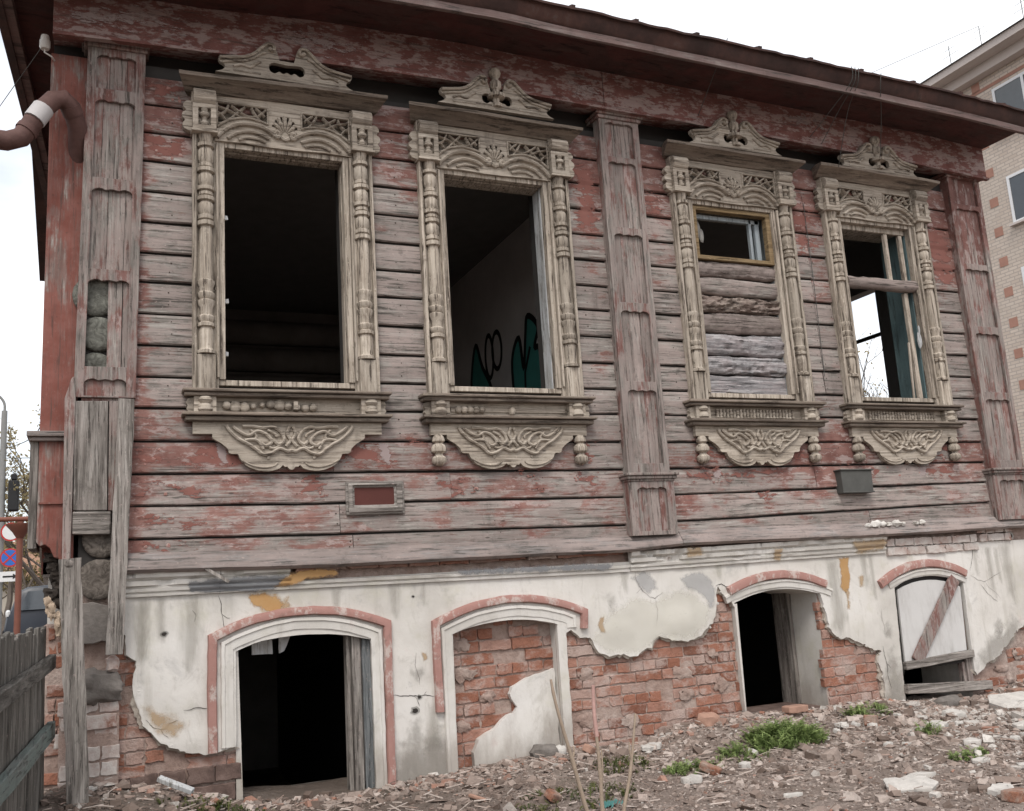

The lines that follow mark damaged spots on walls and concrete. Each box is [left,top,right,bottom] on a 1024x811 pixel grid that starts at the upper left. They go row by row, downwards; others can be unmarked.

peeling [143,128,187,164]
peeling [130,448,207,552]
peeling [182,442,243,470]
peeling [300,441,398,500]
peeling [687,442,783,509]
spalling [885,528,1014,556]
spalling [116,649,141,692]
spalling [566,573,742,748]
spalling [812,602,884,705]
spalling [975,647,1024,692]
spalling [118,703,174,780]
spalling [185,743,242,768]